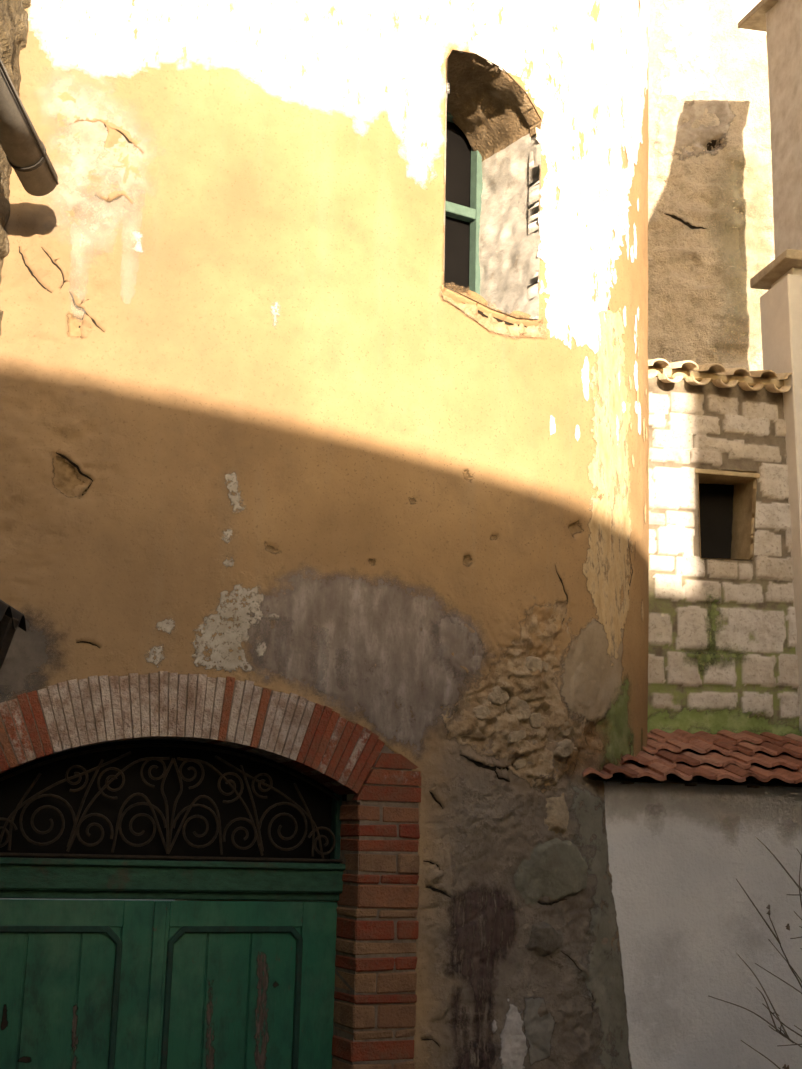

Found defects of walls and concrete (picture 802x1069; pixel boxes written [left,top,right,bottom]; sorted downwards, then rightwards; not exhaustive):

crack [664,209,707,229]
peeling [30,0,736,834]
water stain [0,615,61,703]
water stain [447,885,518,1069]
crack [420,1030,442,1047]
flaking render [492,998,528,1069]